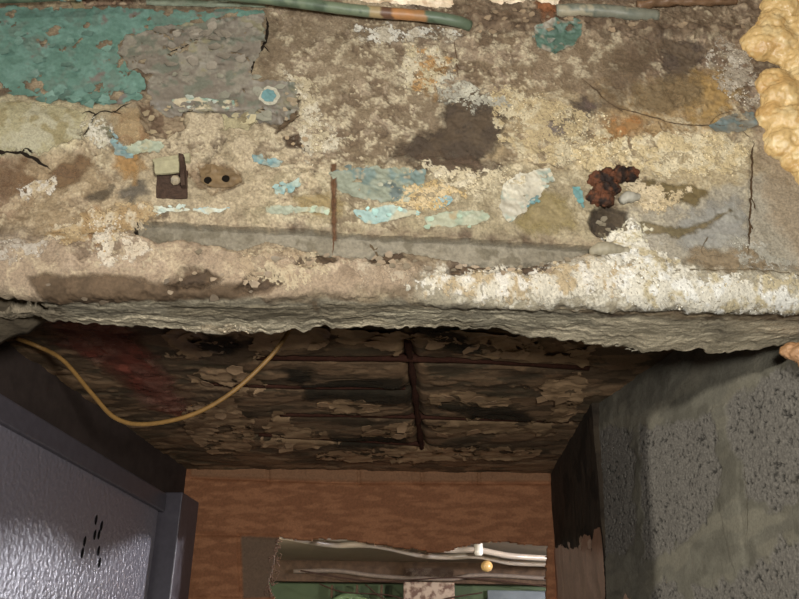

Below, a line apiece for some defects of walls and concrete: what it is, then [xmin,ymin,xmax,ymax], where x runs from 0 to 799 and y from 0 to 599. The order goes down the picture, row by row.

peeling [360,0,454,8]
peeling [0,0,309,158]
crack [0,148,48,167]
peeling [272,177,301,195]
peeling [329,164,490,229]
peeling [499,168,555,223]
spalling [138,187,641,276]
spalling [30,269,282,305]
peeling [161,327,653,464]
peeling [554,527,605,599]